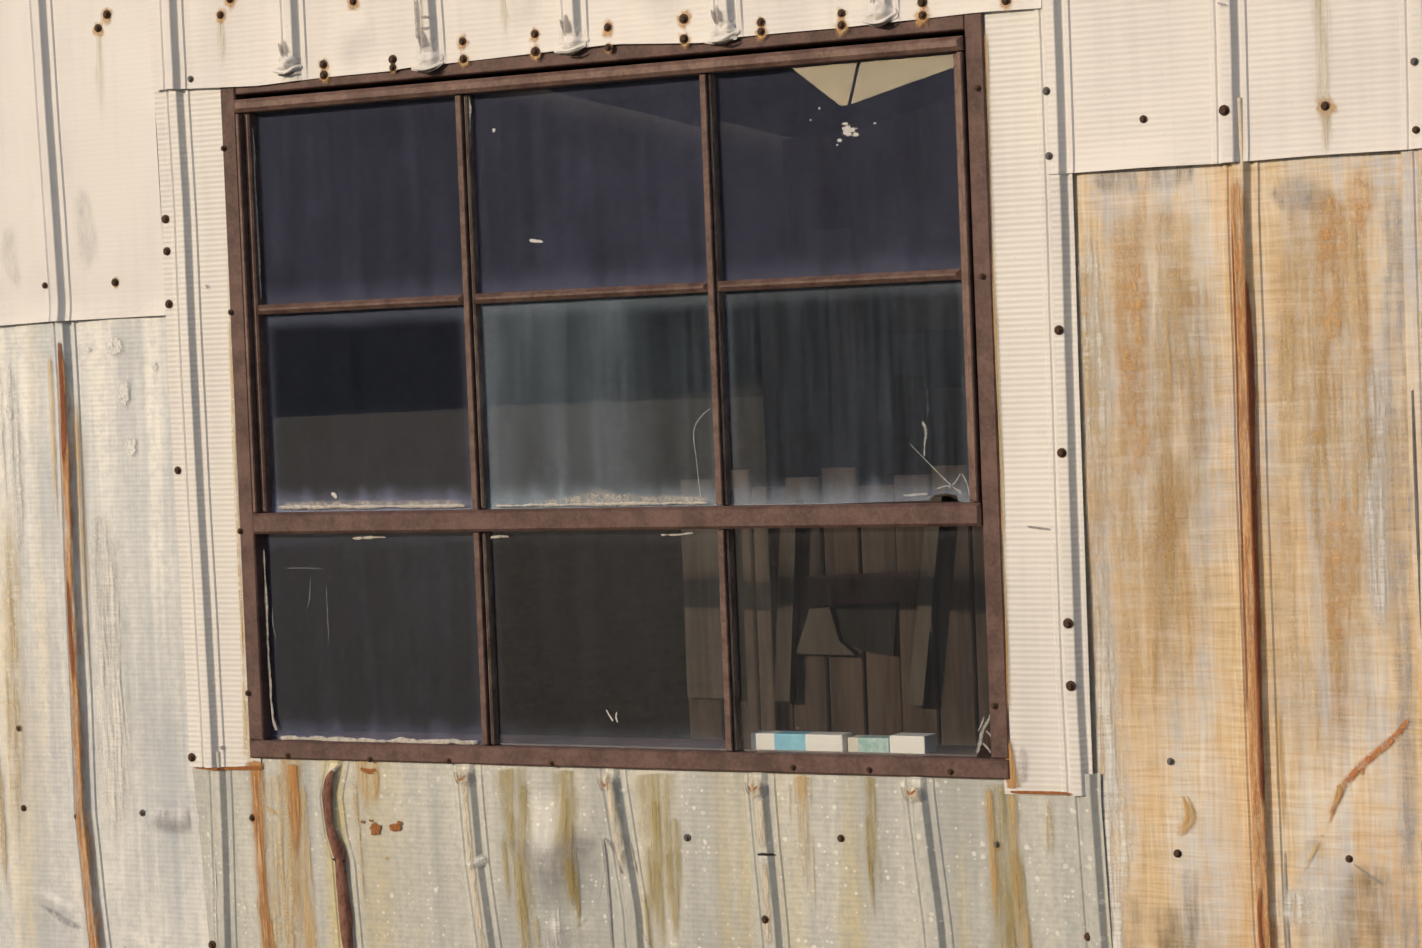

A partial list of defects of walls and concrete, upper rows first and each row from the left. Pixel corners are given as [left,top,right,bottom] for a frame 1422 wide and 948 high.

rust [992,288,1004,528]
rust [48,342,101,948]
rust [196,550,315,948]
rust [322,761,402,948]
rust [502,769,539,948]
rust [559,771,579,918]
rust [1330,720,1408,819]